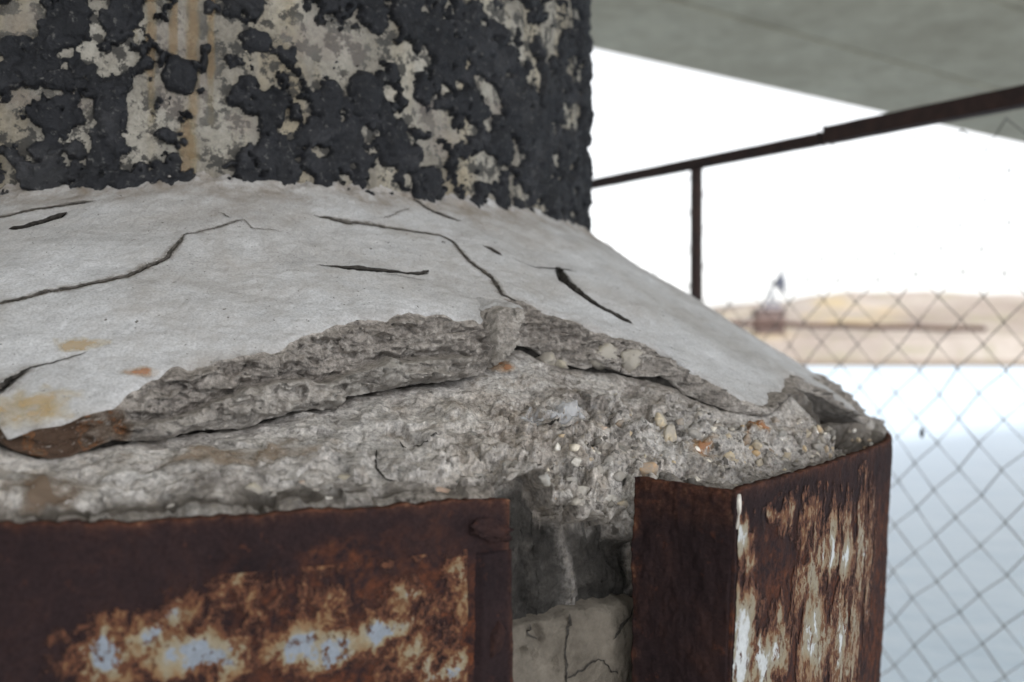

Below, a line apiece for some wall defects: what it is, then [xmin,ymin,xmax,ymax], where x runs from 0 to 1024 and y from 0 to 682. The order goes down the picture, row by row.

peeling [181,93,196,171]
spalling [9,212,67,230]
crack [0,201,91,218]
crack [0,212,281,304]
crack [315,196,515,301]
spalling [25,312,494,453]
rust [0,395,130,459]
spalling [245,482,280,498]
peeling [504,299,878,682]
crack [564,608,633,682]